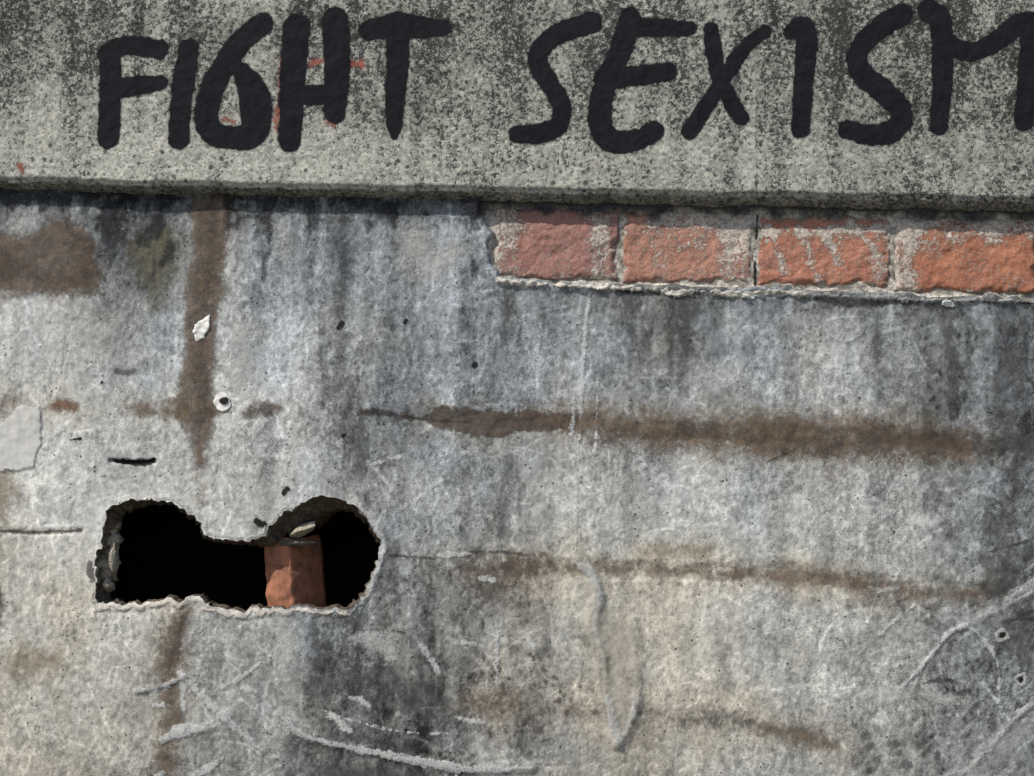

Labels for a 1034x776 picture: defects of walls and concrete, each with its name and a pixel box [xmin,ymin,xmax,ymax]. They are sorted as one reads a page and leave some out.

water stain [317,197,397,386]
water stain [499,289,514,340]
spalling [463,195,1034,307]
spalling [86,486,386,618]
water stain [327,395,401,492]
water stain [438,550,471,558]
water stain [569,282,599,550]
corrosion [356,398,1034,463]
water stain [858,292,1034,706]
water stain [275,612,532,776]
water stain [945,701,1034,776]